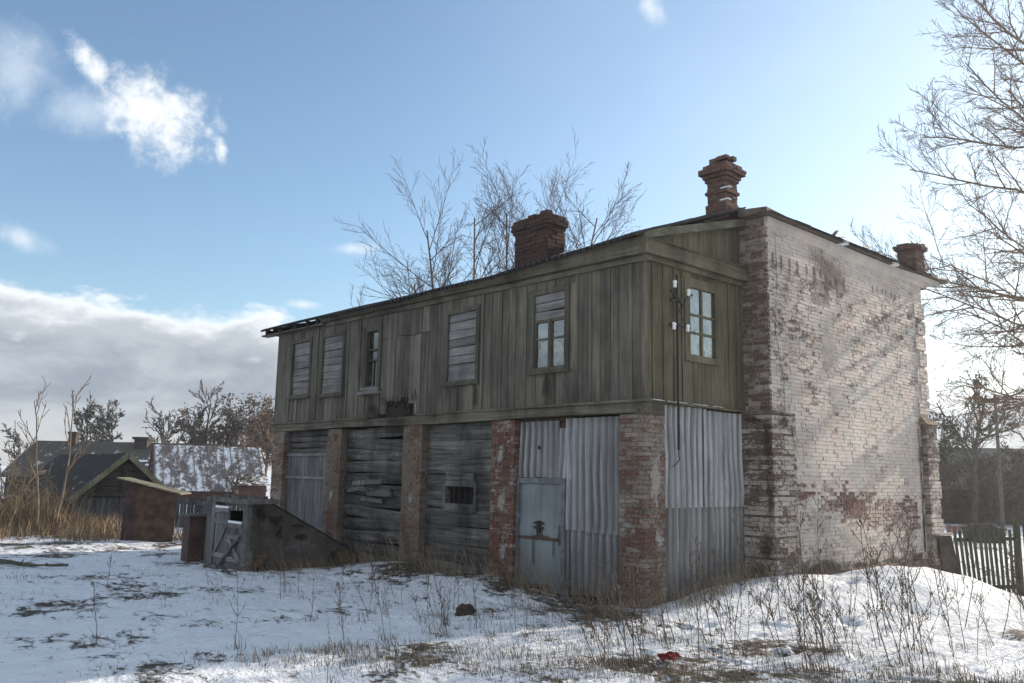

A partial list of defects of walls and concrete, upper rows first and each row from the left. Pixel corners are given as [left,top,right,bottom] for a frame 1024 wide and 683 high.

peeling [777,279,808,344]
spalling [797,480,921,536]